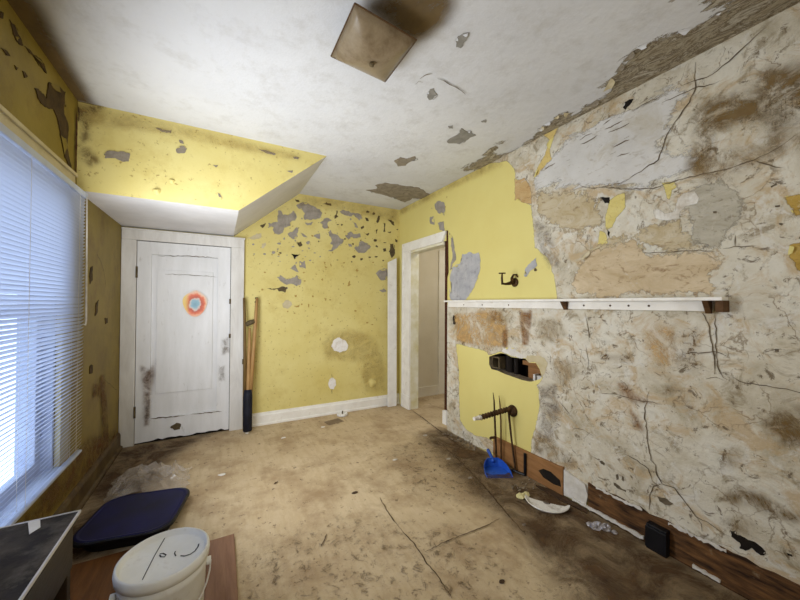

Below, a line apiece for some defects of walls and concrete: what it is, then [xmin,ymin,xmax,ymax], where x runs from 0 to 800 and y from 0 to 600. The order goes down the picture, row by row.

peeling [0,11,72,168]
peeling [104,150,130,162]
peeling [367,183,430,202]
peeling [394,156,418,166]
crack [579,31,797,190]
leakage [691,68,800,171]
peeling [250,200,398,314]
peeling [430,0,800,585]
crack [686,313,800,393]
crack [599,392,730,537]